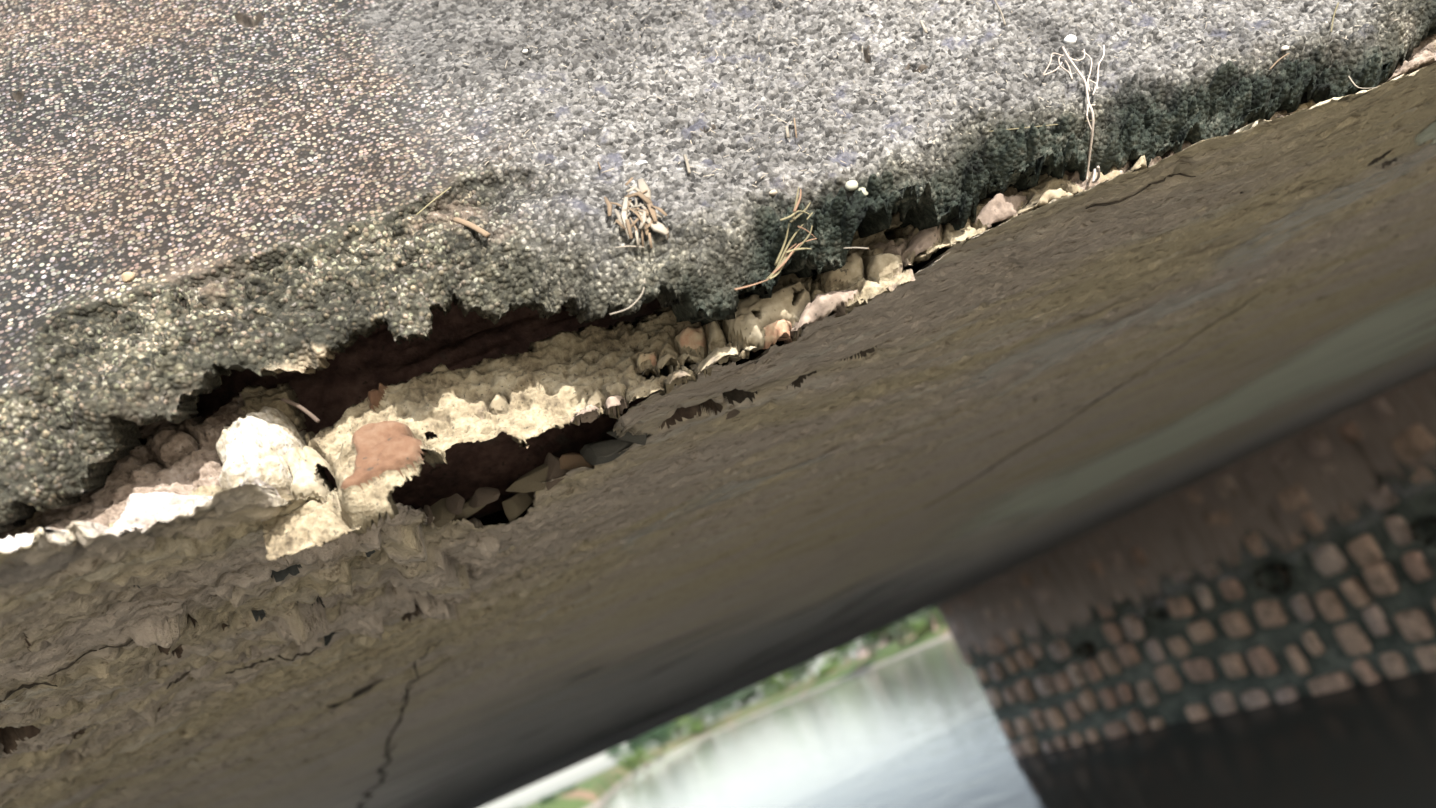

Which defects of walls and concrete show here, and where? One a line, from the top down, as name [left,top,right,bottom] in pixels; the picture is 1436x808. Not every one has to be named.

spalling [0,0,1436,539]
peeling [134,388,757,659]
crack [327,640,451,808]